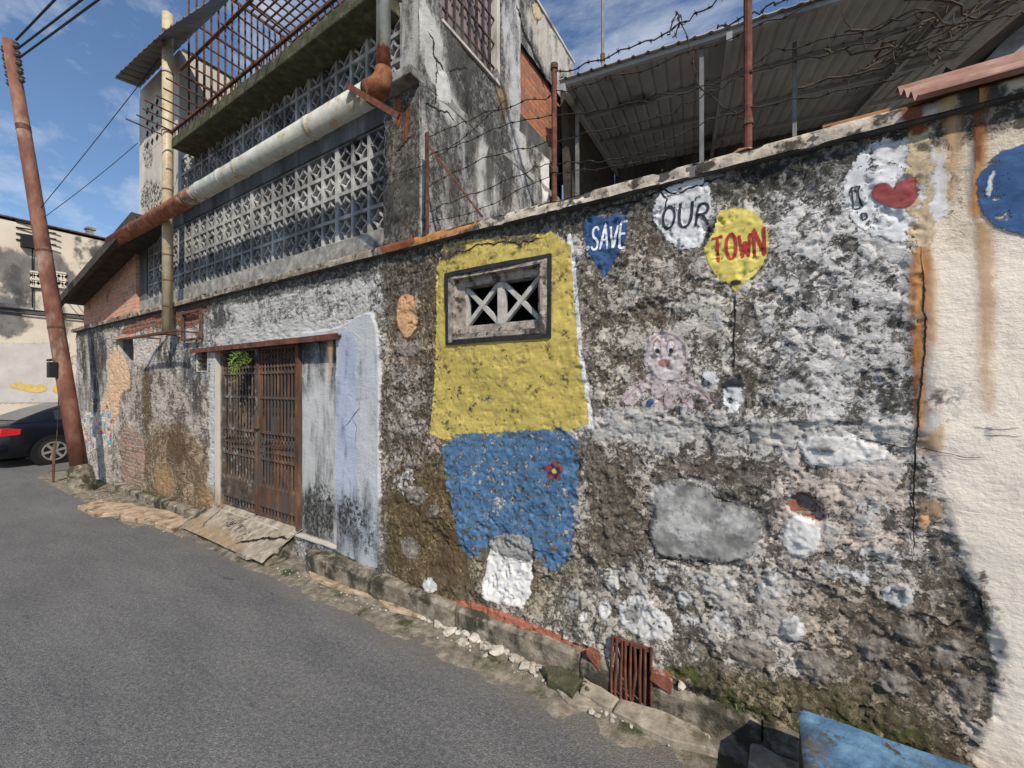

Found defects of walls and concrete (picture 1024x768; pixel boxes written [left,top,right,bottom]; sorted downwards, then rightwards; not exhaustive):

crack [425,30,467,122]
rust [903,95,957,453]
rust [970,86,993,374]
flaking render [102,351,146,489]
leakage [141,371,151,432]
leakage [156,424,185,496]
leakage [157,341,201,413]
crack [852,247,1019,561]
crack [236,535,290,544]
leakage [303,484,375,552]
spalling [567,477,1011,709]